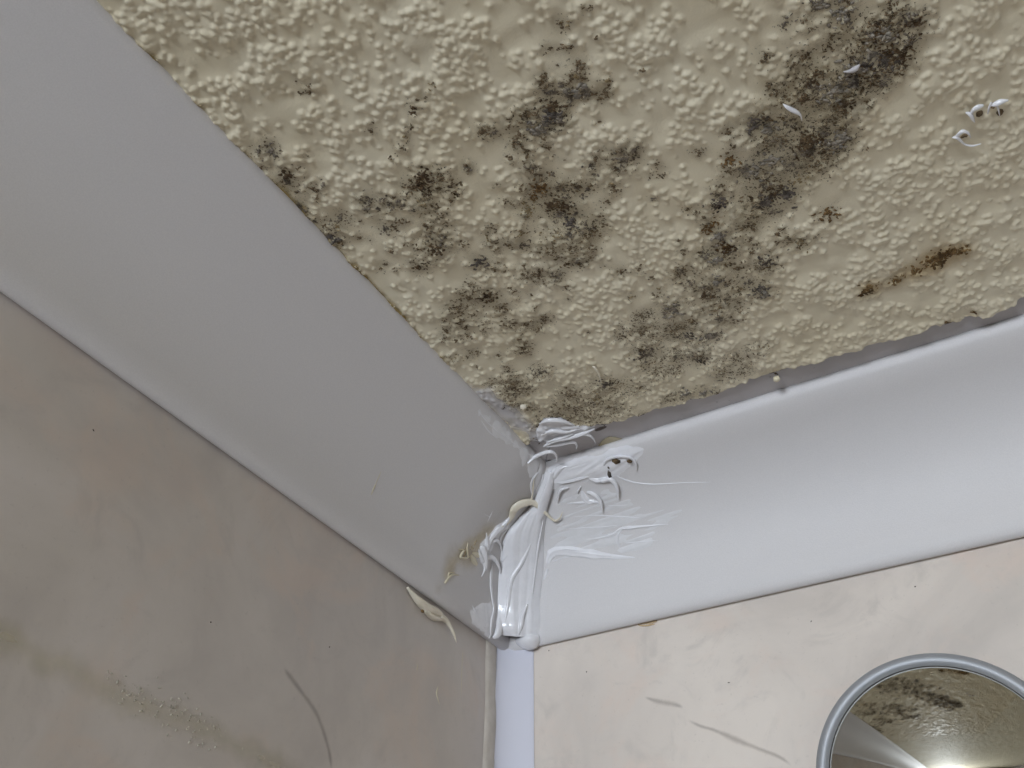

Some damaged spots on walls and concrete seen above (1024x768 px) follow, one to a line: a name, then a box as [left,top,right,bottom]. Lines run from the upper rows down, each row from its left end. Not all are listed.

leakage [250,0,940,444]
peeling [507,480,563,525]